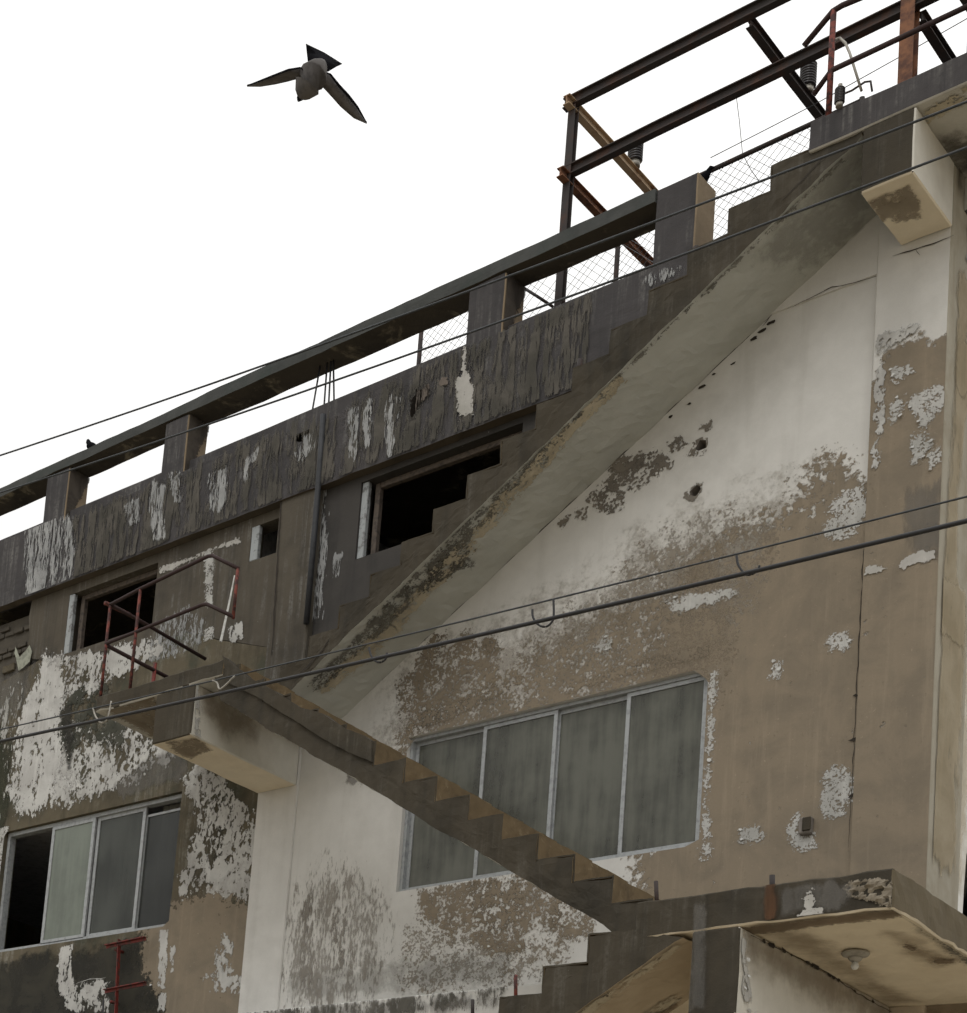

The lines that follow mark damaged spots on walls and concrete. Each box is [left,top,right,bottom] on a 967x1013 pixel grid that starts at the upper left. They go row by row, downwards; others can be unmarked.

spalling [312,360,335,409]
peeling [394,330,947,916]
damp [0,933,166,1013]
peeling [138,886,248,1013]
damp [254,865,505,1013]
peeling [397,874,597,994]
damp [742,910,902,934]
damp [933,939,967,964]